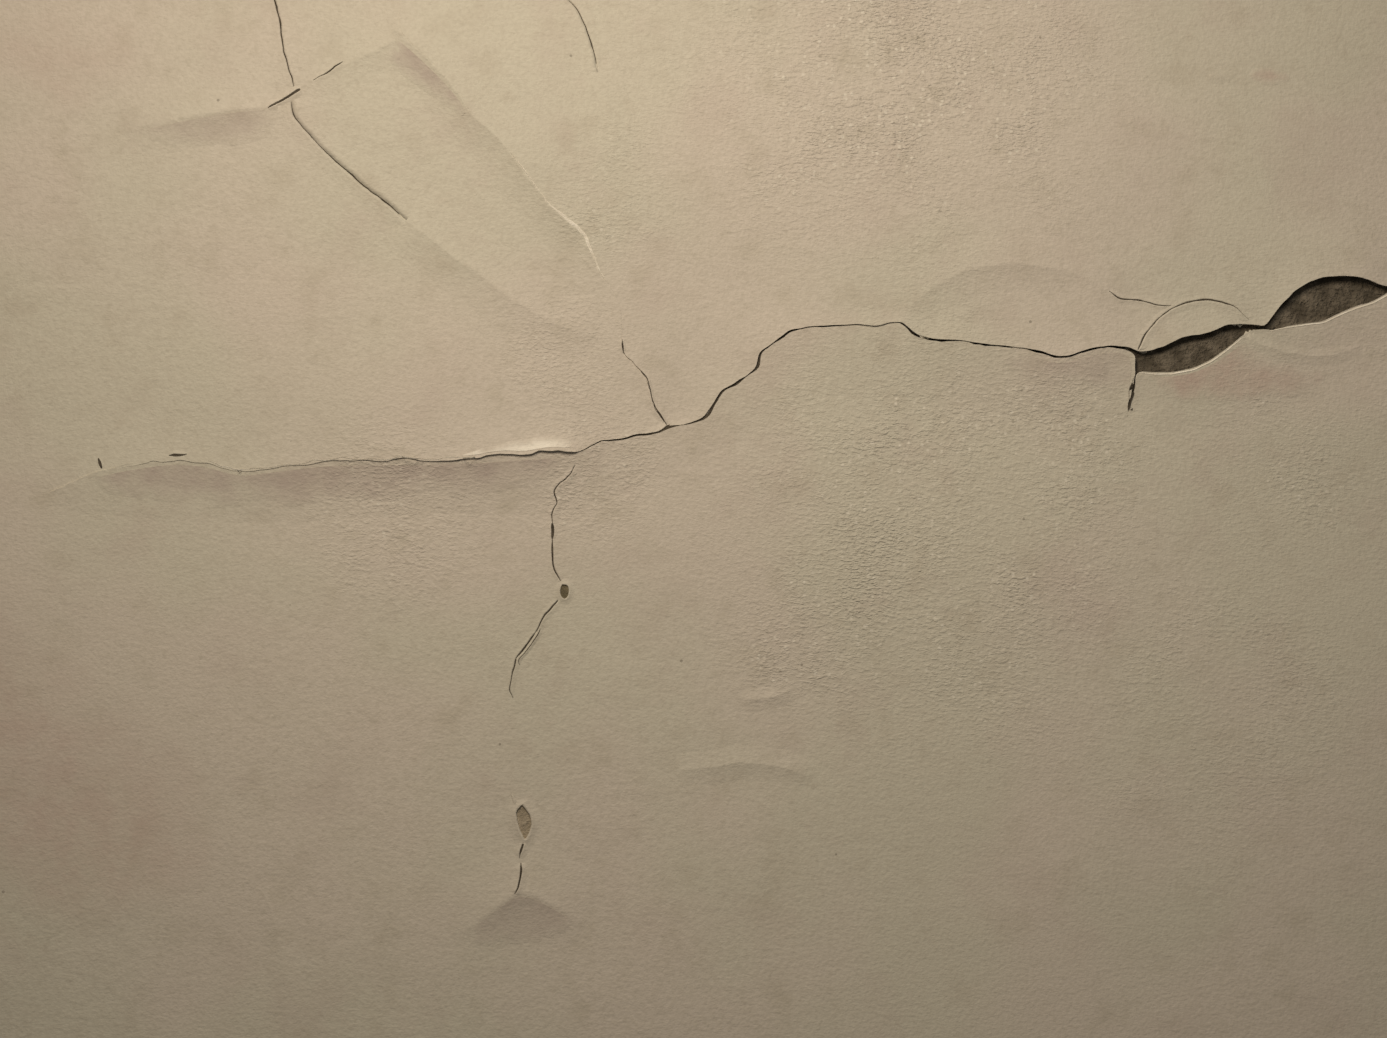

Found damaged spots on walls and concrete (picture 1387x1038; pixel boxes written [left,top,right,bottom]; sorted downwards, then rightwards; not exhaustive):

crack [266,0,344,114]
crack [367,0,703,425]
peeling [42,163,1387,524]
crack [1136,294,1249,354]
crack [96,458,104,469]
crack [169,449,187,457]
crack [504,465,578,698]